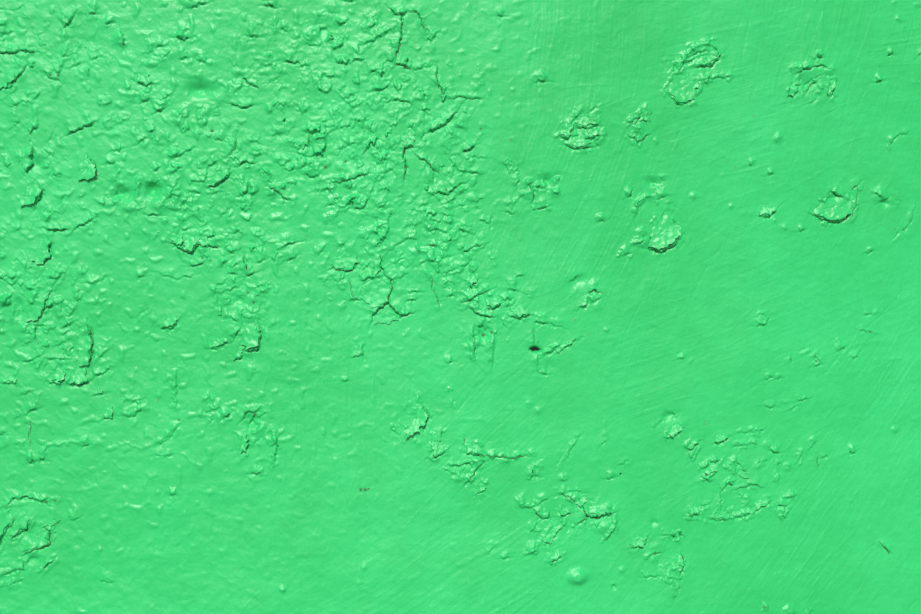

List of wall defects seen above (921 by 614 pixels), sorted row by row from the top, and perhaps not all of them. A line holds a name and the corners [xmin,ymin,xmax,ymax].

peeling [660,33,734,113]
peeling [781,50,842,109]
peeling [552,101,608,156]
peeling [621,102,655,149]
peeling [0,0,575,481]
peeling [616,174,686,262]
peeling [753,200,785,224]
peeling [805,175,865,229]
peeling [562,269,607,315]
peeling [386,394,807,605]
peeling [0,489,66,590]